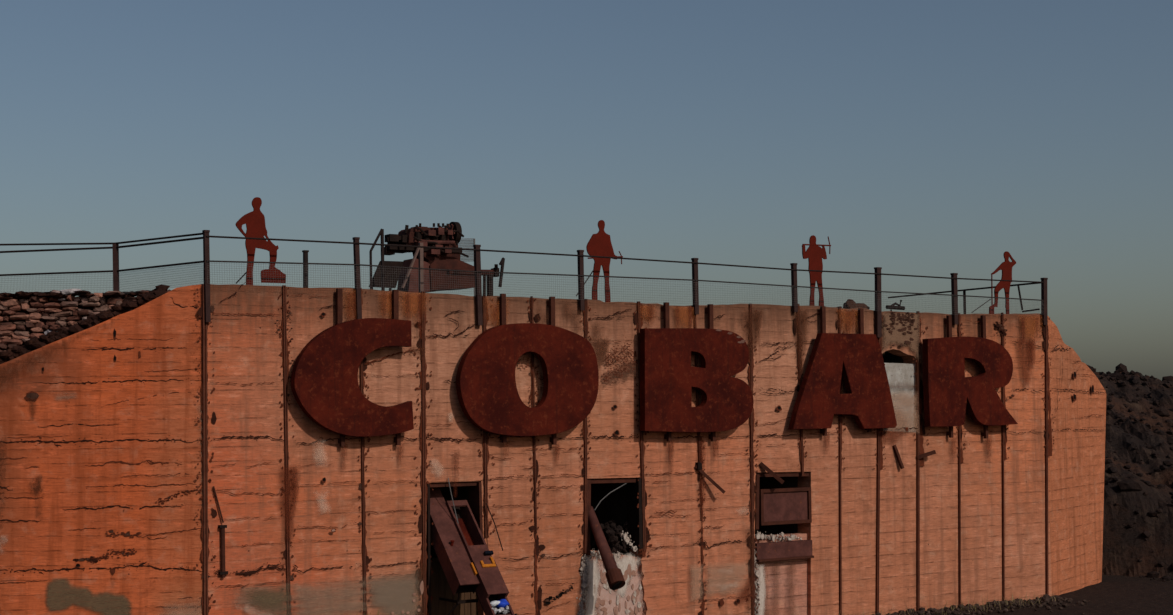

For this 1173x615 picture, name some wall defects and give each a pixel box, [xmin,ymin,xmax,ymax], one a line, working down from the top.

crack [170,282,350,317]
crack [0,338,422,608]
rust [283,468,297,535]
peeling [587,303,652,615]
damp [46,579,131,615]